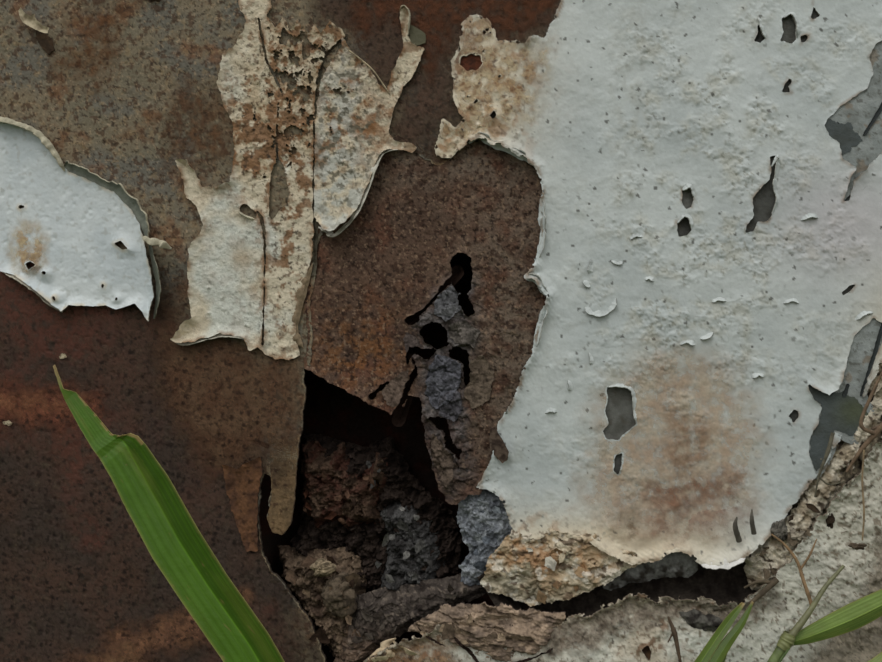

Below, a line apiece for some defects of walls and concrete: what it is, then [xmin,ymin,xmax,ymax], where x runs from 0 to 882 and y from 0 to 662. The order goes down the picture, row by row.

peeling [0,117,172,321]
peeling [171,0,426,360]
peeling [677,183,696,237]
peeling [745,154,780,233]
peeling [825,41,882,201]
corrosion [0,0,555,662]
peeling [603,383,637,440]
corrosion [595,359,753,535]
crack [784,363,882,519]
peeling [808,311,882,479]
peeling [480,528,642,607]
crack [477,552,756,632]